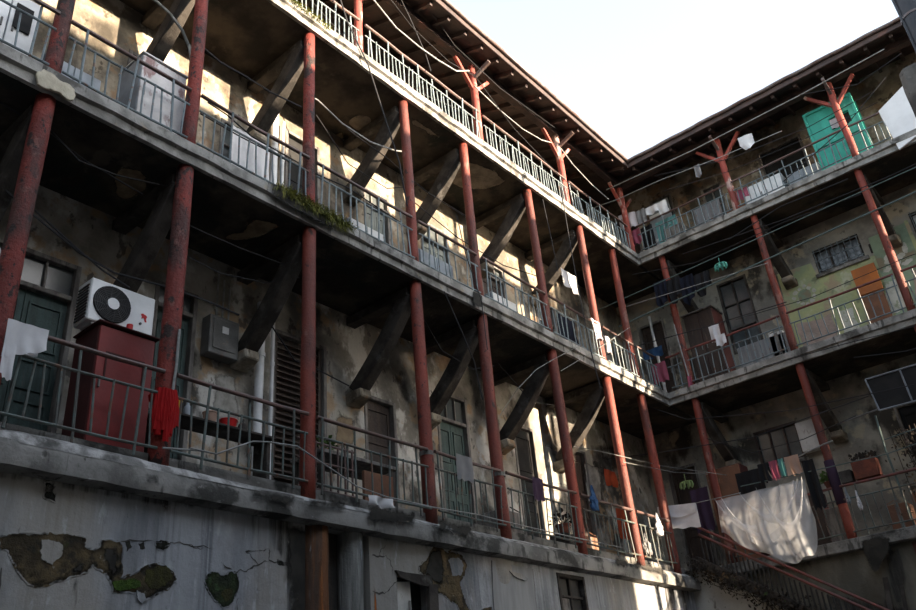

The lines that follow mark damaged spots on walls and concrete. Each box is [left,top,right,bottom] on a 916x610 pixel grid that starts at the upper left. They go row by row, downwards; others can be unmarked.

flaking render [0,531,178,604]
crack [121,539,210,550]
crack [224,548,287,573]
flaking render [418,547,492,610]